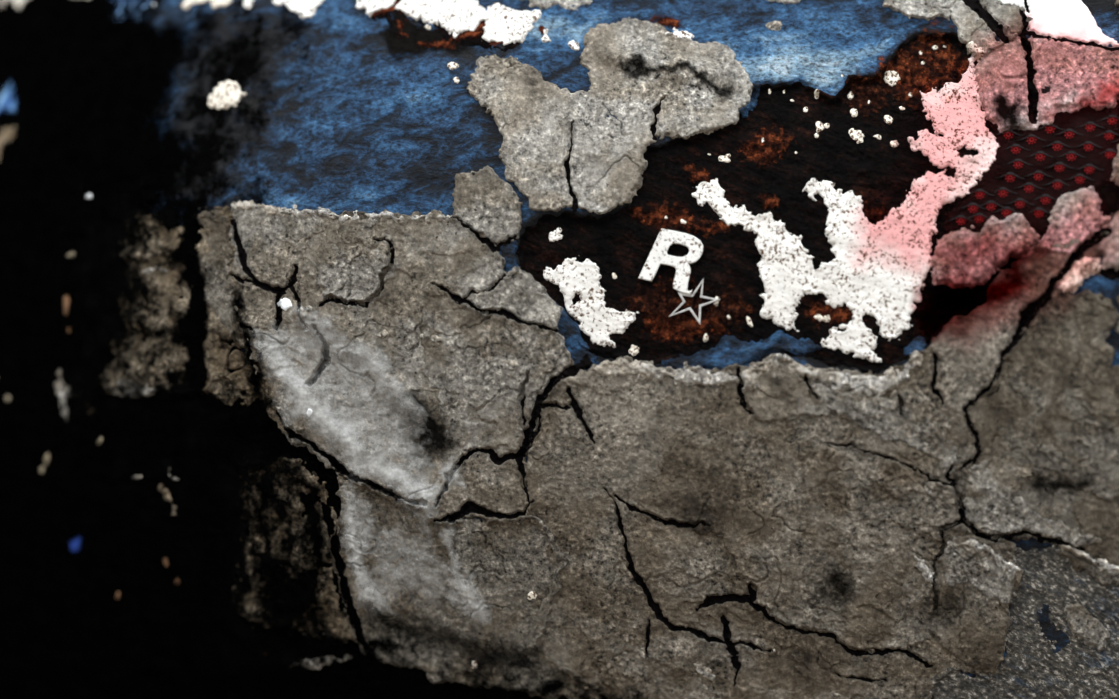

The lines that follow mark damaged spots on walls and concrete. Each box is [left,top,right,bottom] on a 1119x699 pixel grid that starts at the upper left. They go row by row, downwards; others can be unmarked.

peeling [181,0,255,10]
peeling [273,0,324,19]
peeling [356,0,551,52]
peeling [207,80,247,110]
spalling [516,19,999,397]
crack [231,219,395,387]
crack [432,216,559,333]
spalling [1057,253,1104,293]
crack [278,354,595,523]
crack [736,367,754,415]
crack [827,227,1119,603]
crack [604,488,933,687]